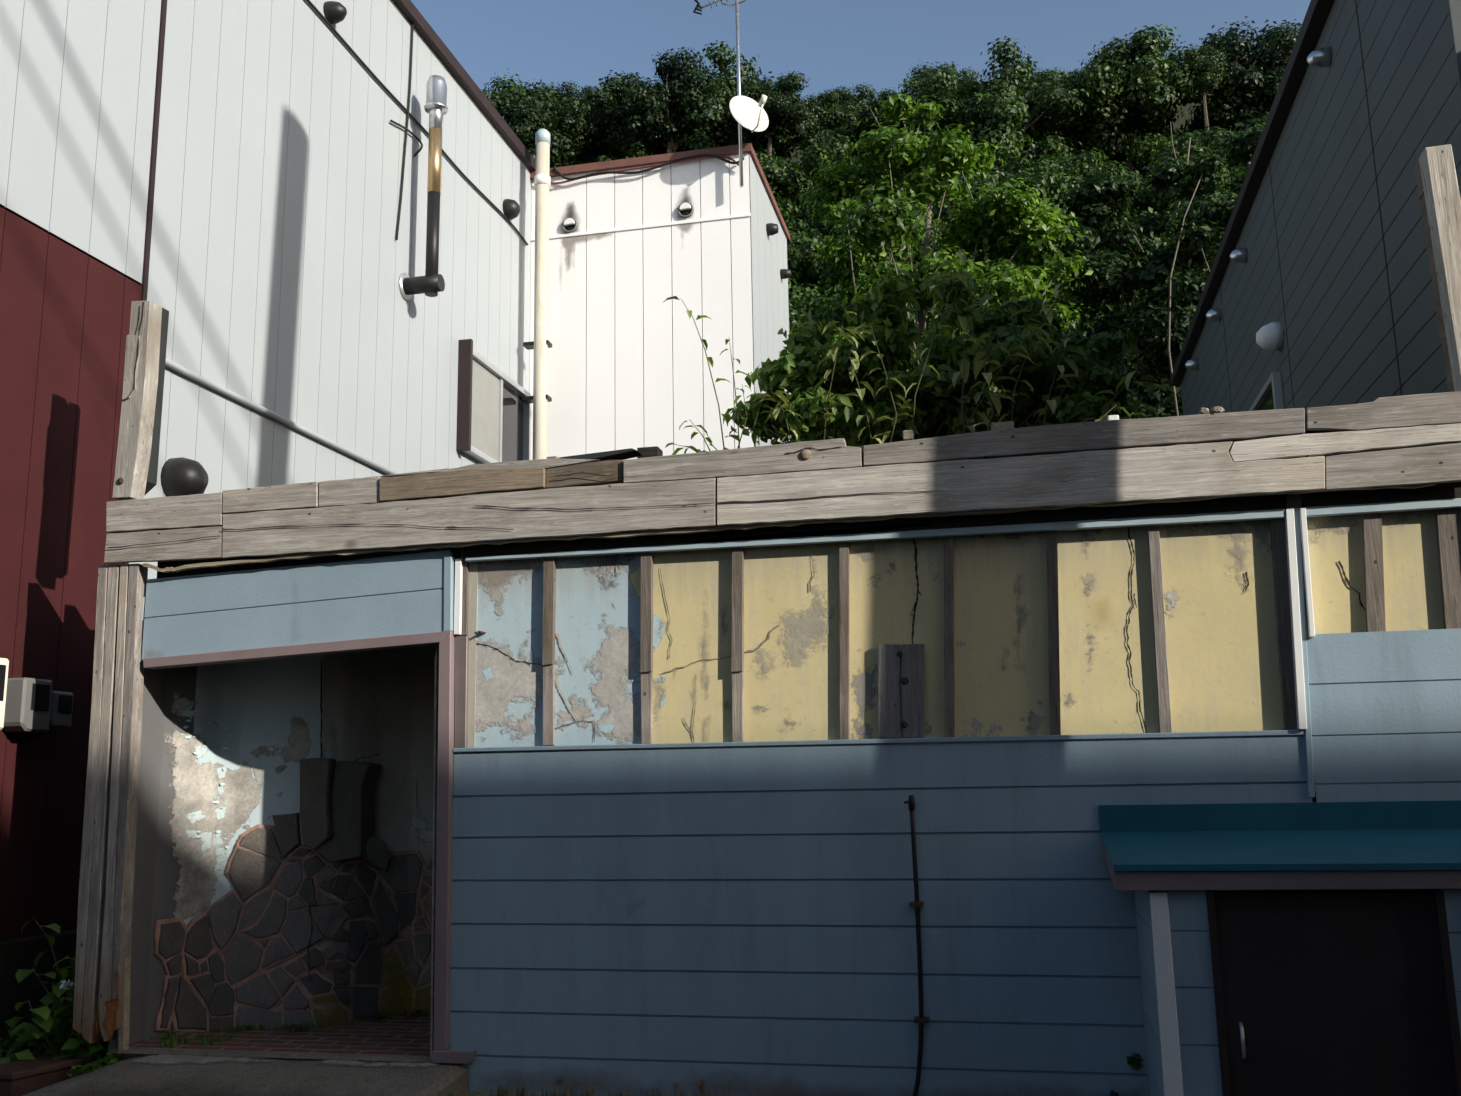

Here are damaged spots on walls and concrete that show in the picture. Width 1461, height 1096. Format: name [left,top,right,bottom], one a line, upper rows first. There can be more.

peeling [461,553,667,750]
crack [660,568,780,743]
peeling [754,587,833,678]
crack [909,539,922,644]
crack [1126,527,1147,733]
peeling [164,690,312,920]